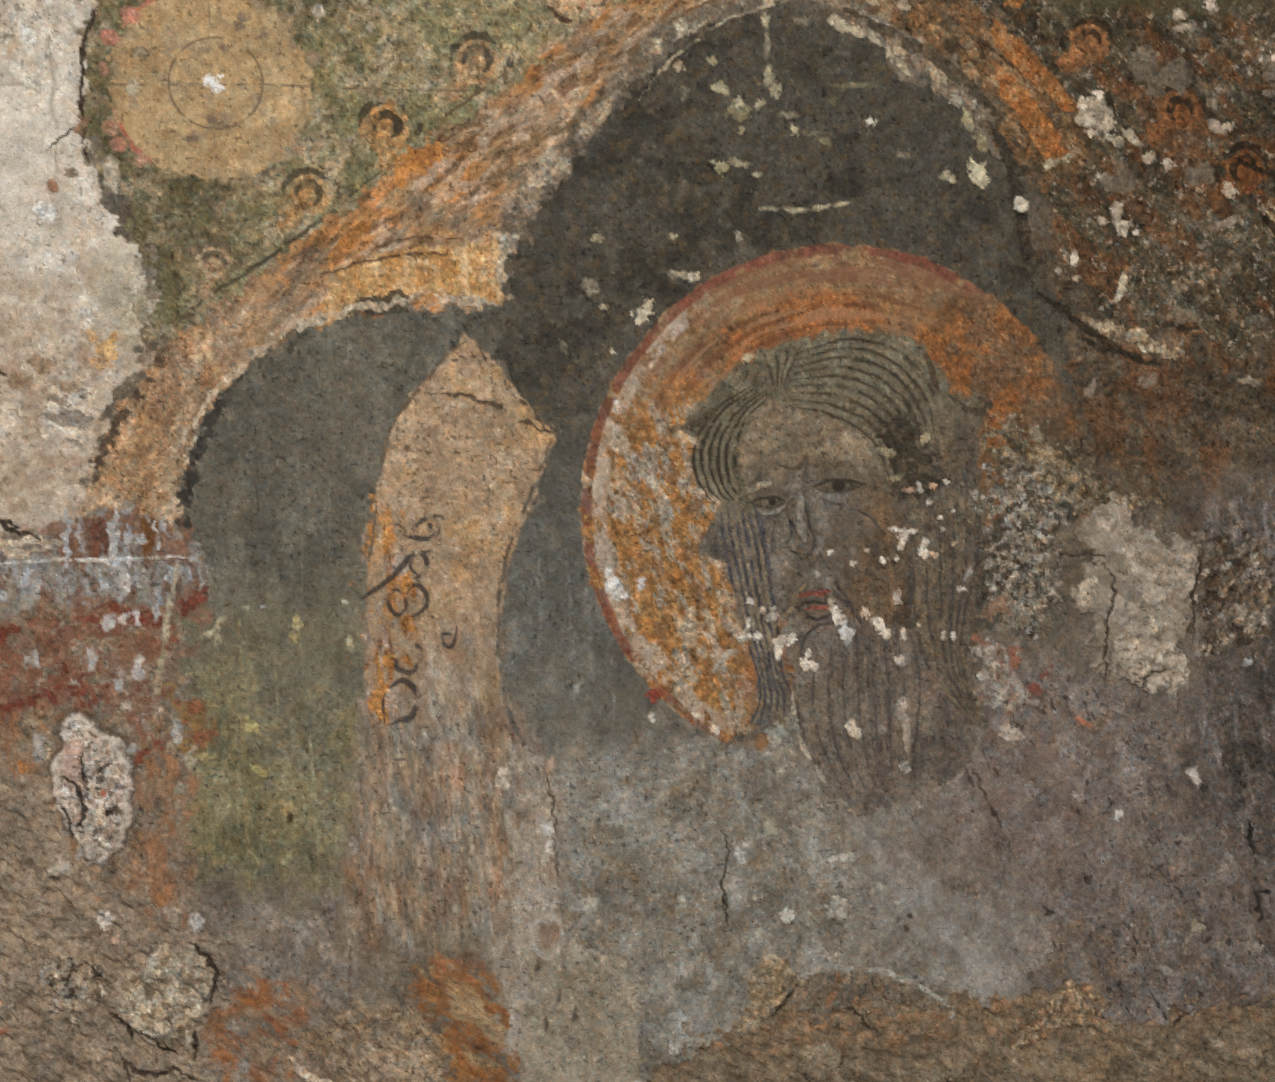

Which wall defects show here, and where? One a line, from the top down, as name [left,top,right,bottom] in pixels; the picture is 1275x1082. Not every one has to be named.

peeling [1171,0,1218,34]
peeling [1072,88,1243,250]
peeling [1054,248,1083,283]
crack [0,368,8,378]
peeling [5,351,82,395]
crack [0,518,42,542]
peeling [813,404,1275,720]
peeling [707,595,820,675]
peeling [843,695,916,774]
spalling [0,709,247,1082]
spalling [258,987,461,1082]
spalling [516,929,1275,1082]